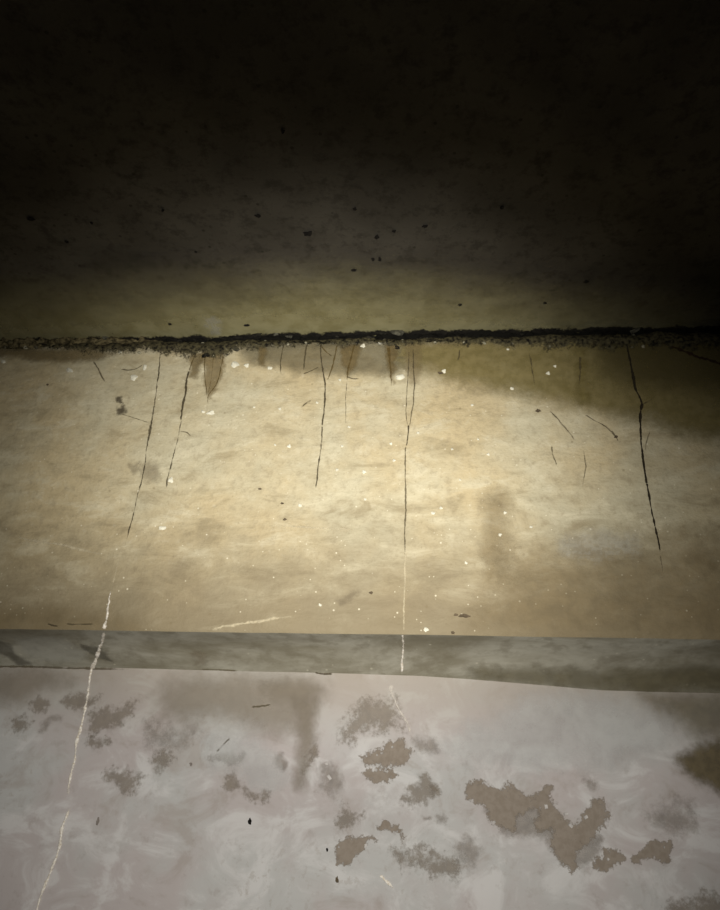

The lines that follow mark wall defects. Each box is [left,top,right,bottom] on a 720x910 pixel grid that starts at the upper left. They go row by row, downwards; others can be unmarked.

crack [94,340,160,534]
crack [166,356,195,486]
crack [280,344,357,485]
leakage [0,305,720,435]
crack [387,348,415,579]
crack [626,345,660,550]
crack [390,610,410,731]
crack [0,593,112,910]
peeling [326,810,405,883]
peeling [360,738,412,784]
peeling [465,779,611,873]
peeling [593,839,673,872]